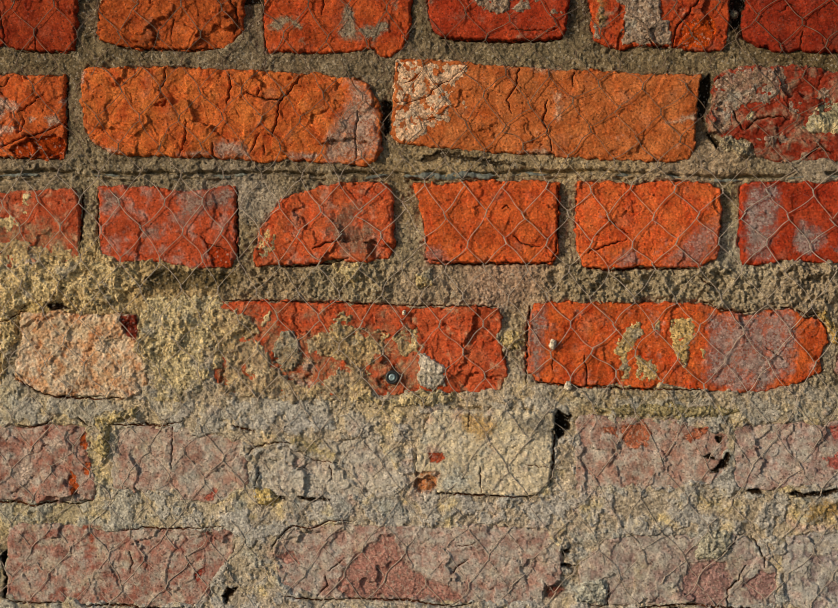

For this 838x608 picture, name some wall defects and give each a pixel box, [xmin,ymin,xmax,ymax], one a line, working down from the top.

crack [120,20,220,89]
crack [227,74,299,152]
water stain [391,58,474,145]
peeling [391,327,420,357]
flaking render [614,321,660,382]
flaking render [655,318,696,368]